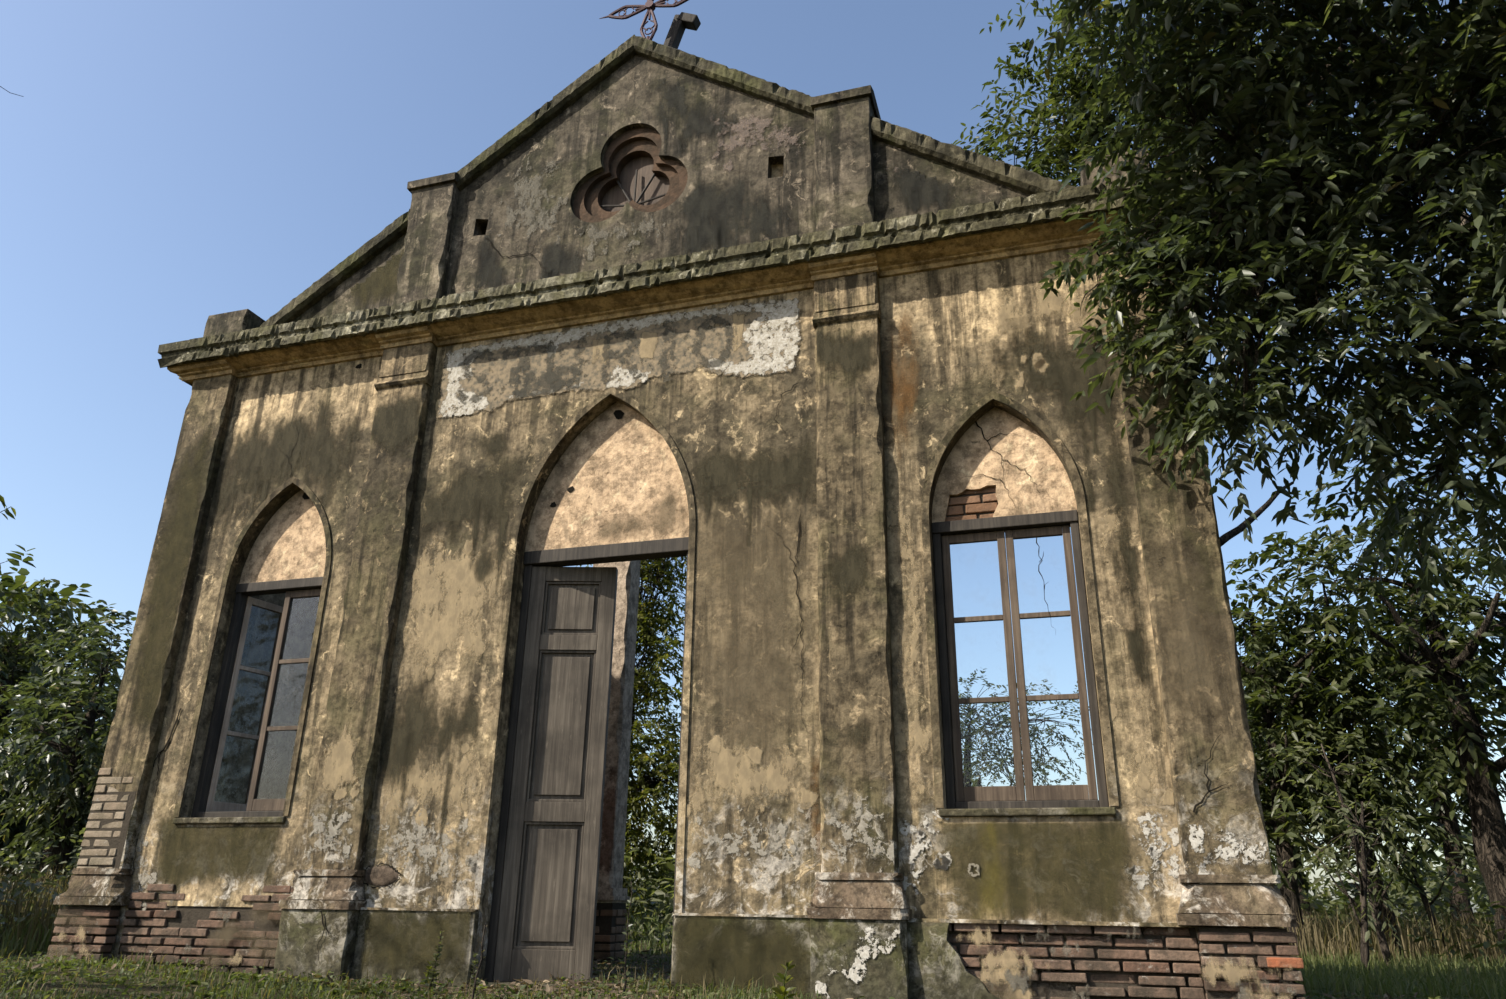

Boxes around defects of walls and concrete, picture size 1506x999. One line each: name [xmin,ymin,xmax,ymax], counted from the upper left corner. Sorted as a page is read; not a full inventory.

leakage [675,180,789,254]
leakage [475,235,507,291]
leakage [540,241,581,279]
flaking render [945,487,998,521]
leakage [380,689,487,841]
peeling [1125,733,1268,892]
flaking render [47,768,295,975]
peeling [815,926,900,999]
flaking render [935,922,1306,999]